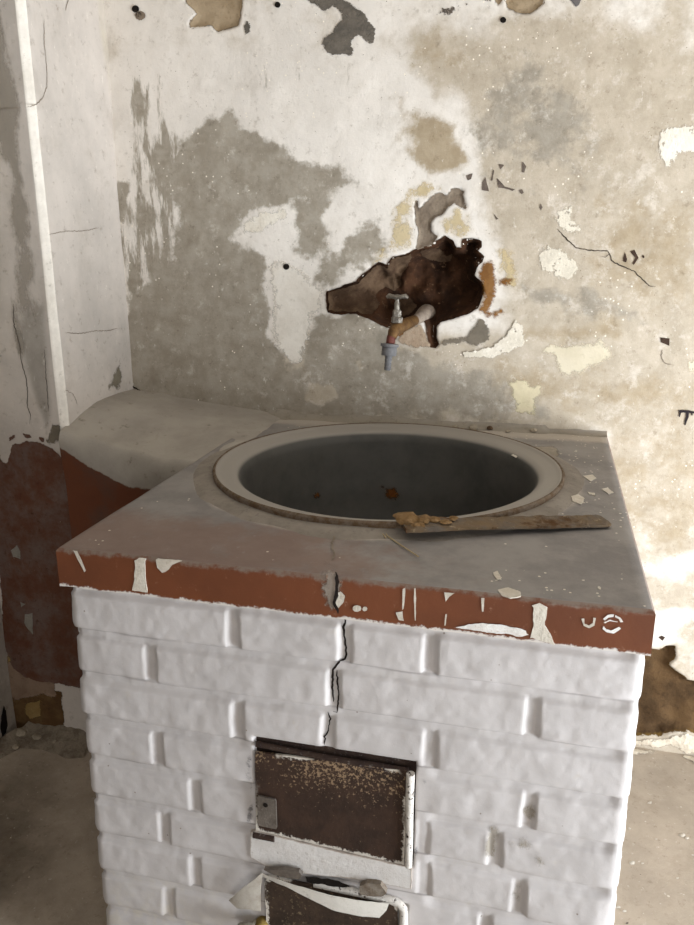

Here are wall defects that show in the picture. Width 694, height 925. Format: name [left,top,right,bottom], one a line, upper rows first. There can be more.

flaking render [186,0,243,32]
flaking render [495,0,545,14]
damp [0,22,33,308]
peeling [482,164,524,194]
spalling [326,188,484,348]
crack [558,230,655,287]
crack [323,536,347,745]
damp [633,733,694,763]